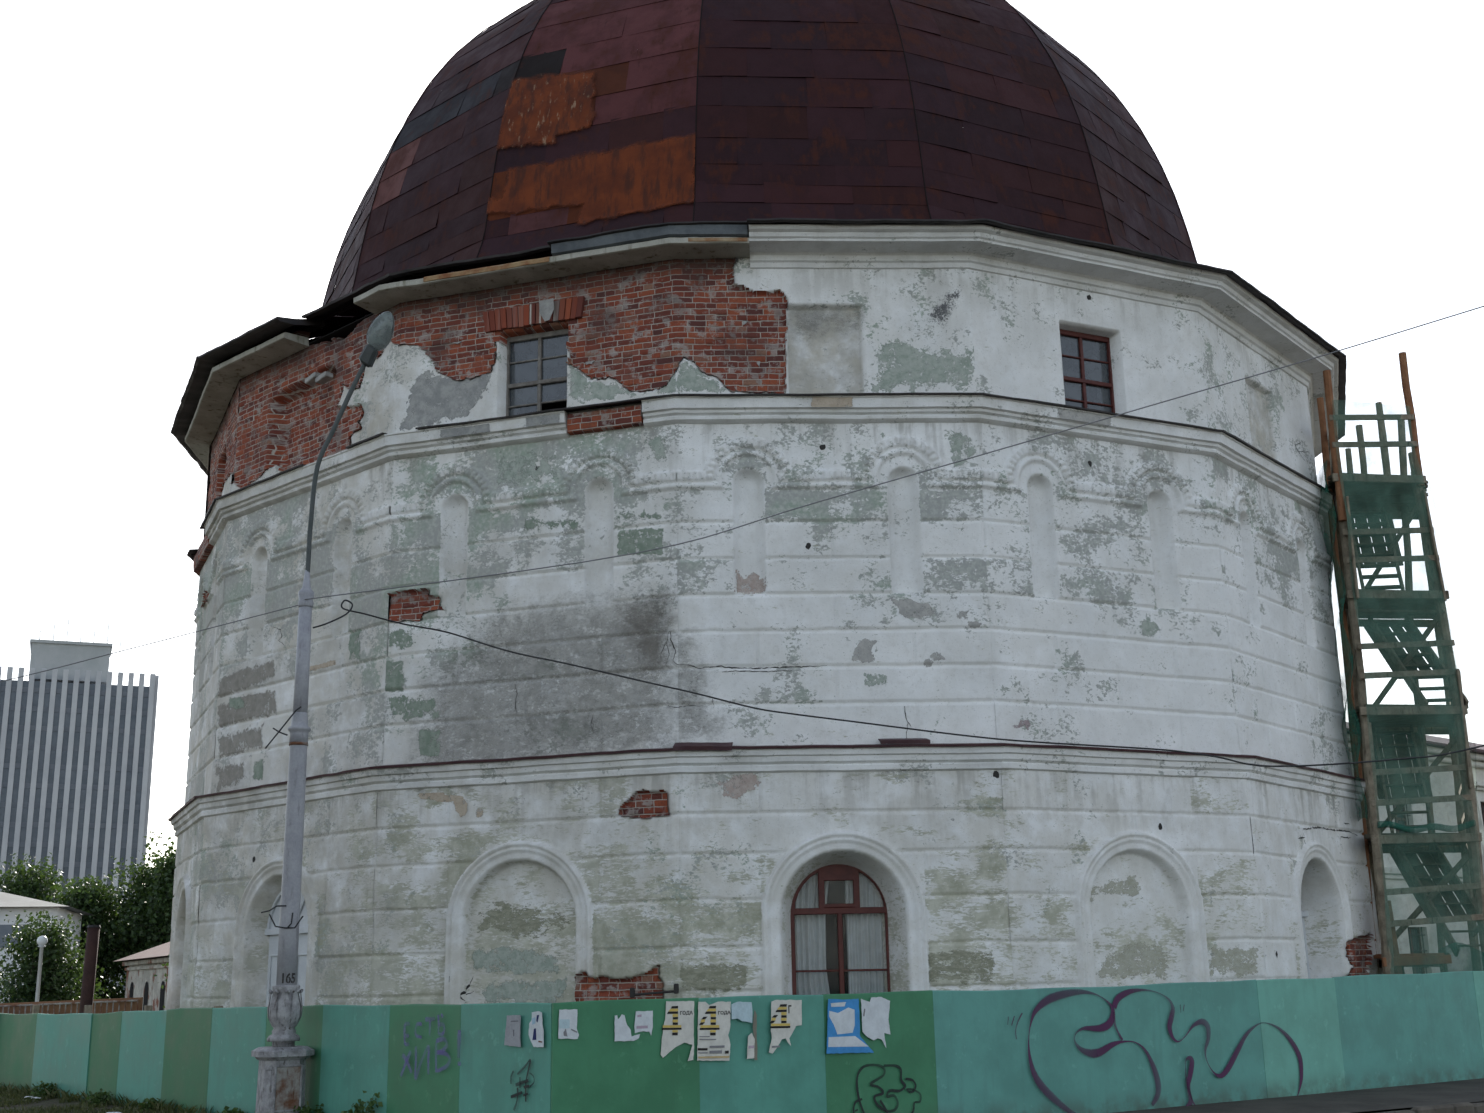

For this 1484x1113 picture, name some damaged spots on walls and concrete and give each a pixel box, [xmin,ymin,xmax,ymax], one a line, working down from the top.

corrosion [486,71,695,225]
spalling [207,258,788,512]
peeling [870,338,976,393]
peeling [524,517,578,531]
peeling [617,510,664,555]
spalling [193,535,214,608]
peeling [734,570,766,594]
spalling [385,588,444,757]
spalling [619,789,670,819]
peeling [472,901,748,1003]
spalling [1346,934,1374,976]